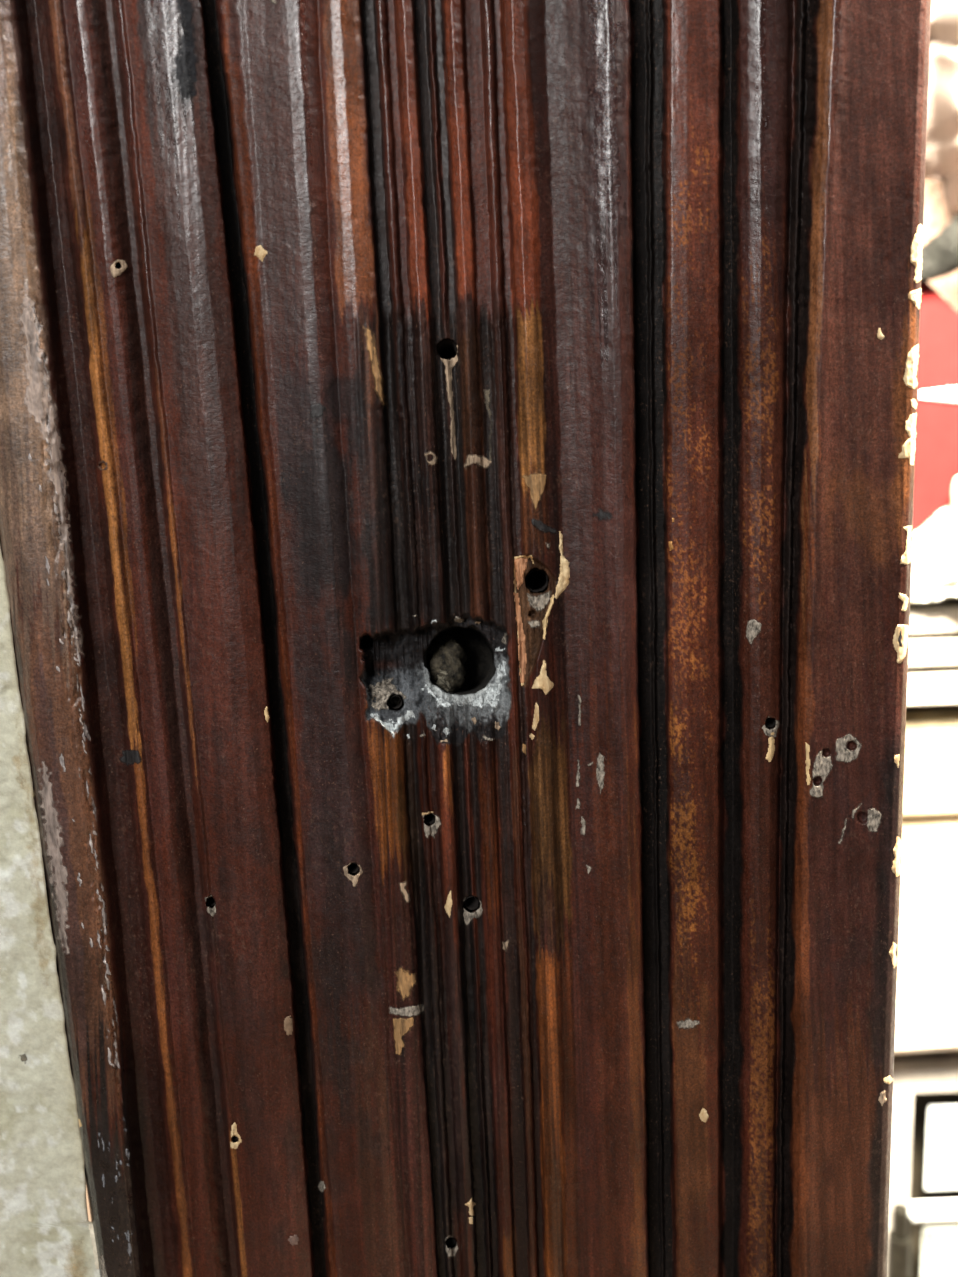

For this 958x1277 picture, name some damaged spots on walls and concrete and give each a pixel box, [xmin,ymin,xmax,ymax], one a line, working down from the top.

peeling [531,519,570,599]
peeling [893,624,909,663]
spalling [805,734,862,798]
spalling [838,804,881,844]